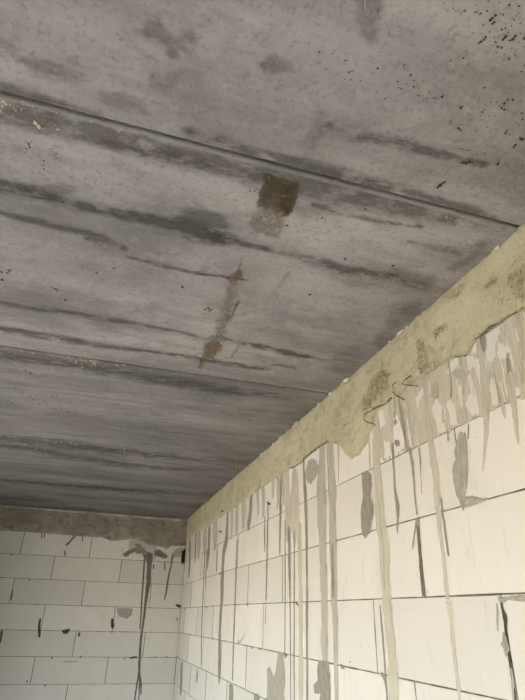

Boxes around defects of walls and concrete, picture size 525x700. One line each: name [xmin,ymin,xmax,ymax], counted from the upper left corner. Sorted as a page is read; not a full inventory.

water stain [0,179,269,252]
water stain [0,100,484,223]
rust [251,174,299,237]
water stain [0,327,263,370]
water stain [0,348,270,396]
rust [198,263,242,369]
water stain [318,260,396,279]
water stain [373,311,525,700]
water stain [123,544,173,700]
water stain [188,460,308,700]
water stain [317,442,339,700]
crack [500,602,516,700]